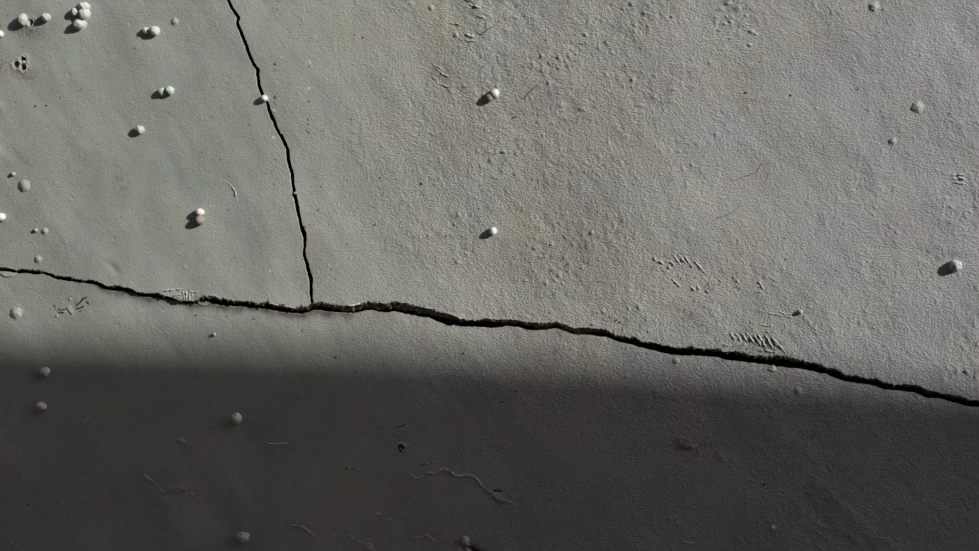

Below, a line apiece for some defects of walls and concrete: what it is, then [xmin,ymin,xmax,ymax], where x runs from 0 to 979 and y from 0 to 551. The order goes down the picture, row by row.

crack [0,0,979,407]